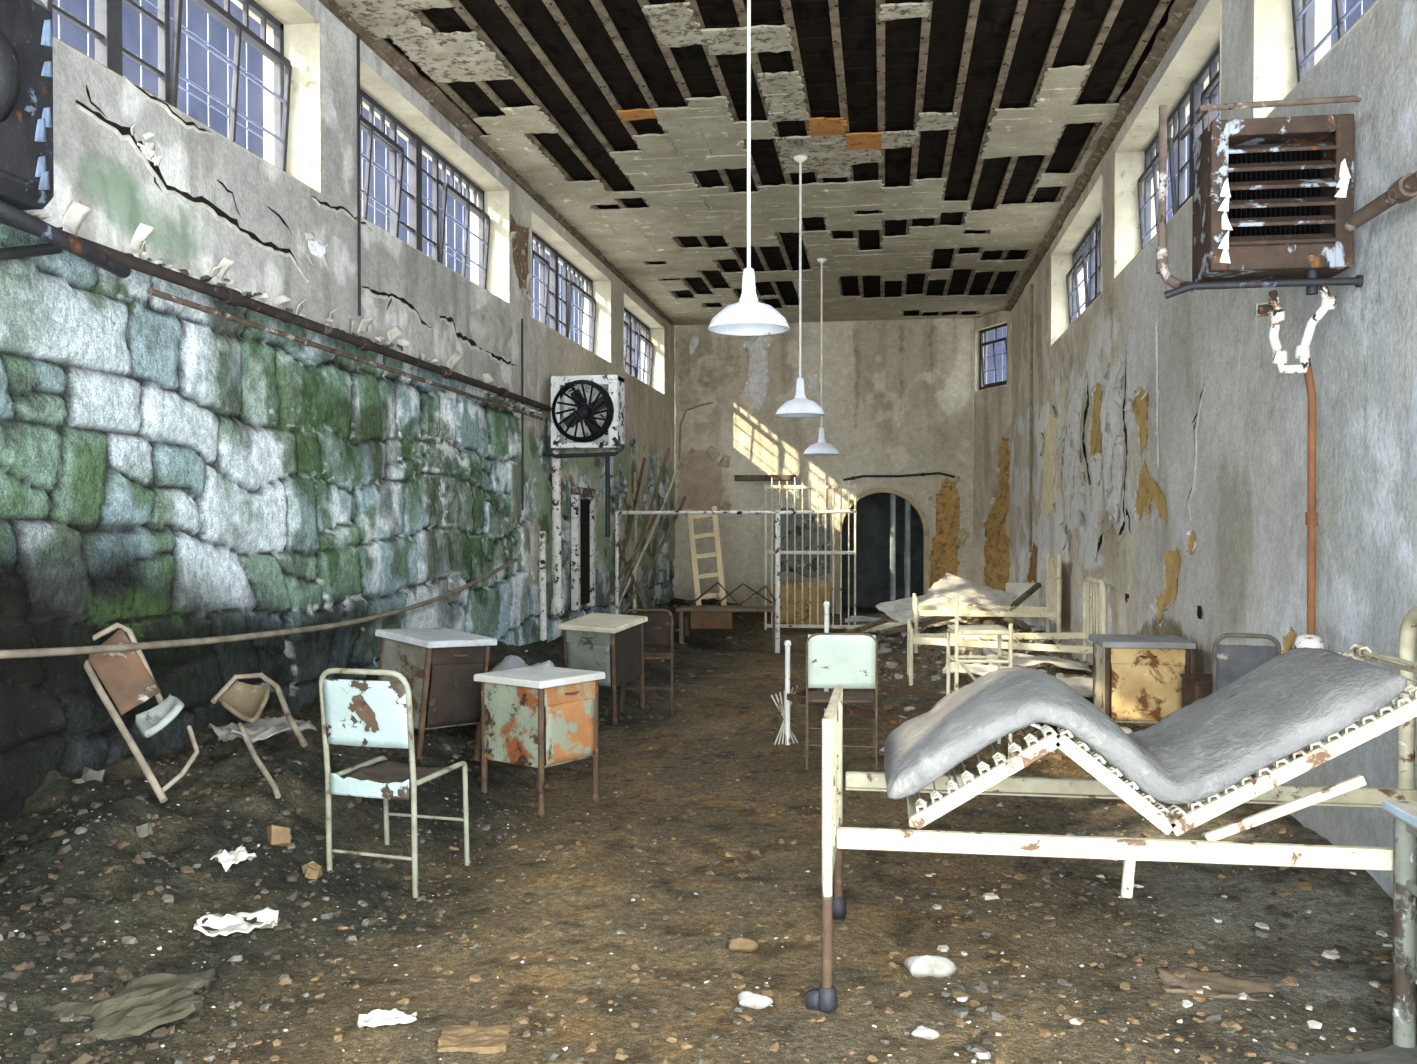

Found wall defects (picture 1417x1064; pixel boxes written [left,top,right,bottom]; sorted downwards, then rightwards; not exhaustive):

crack [75,75,310,283]
crack [311,196,373,232]
crack [362,286,518,368]
leakage [434,443,465,465]
peeling [1040,356,1167,551]
flaking render [929,427,1038,592]
flaking render [1148,530,1197,628]